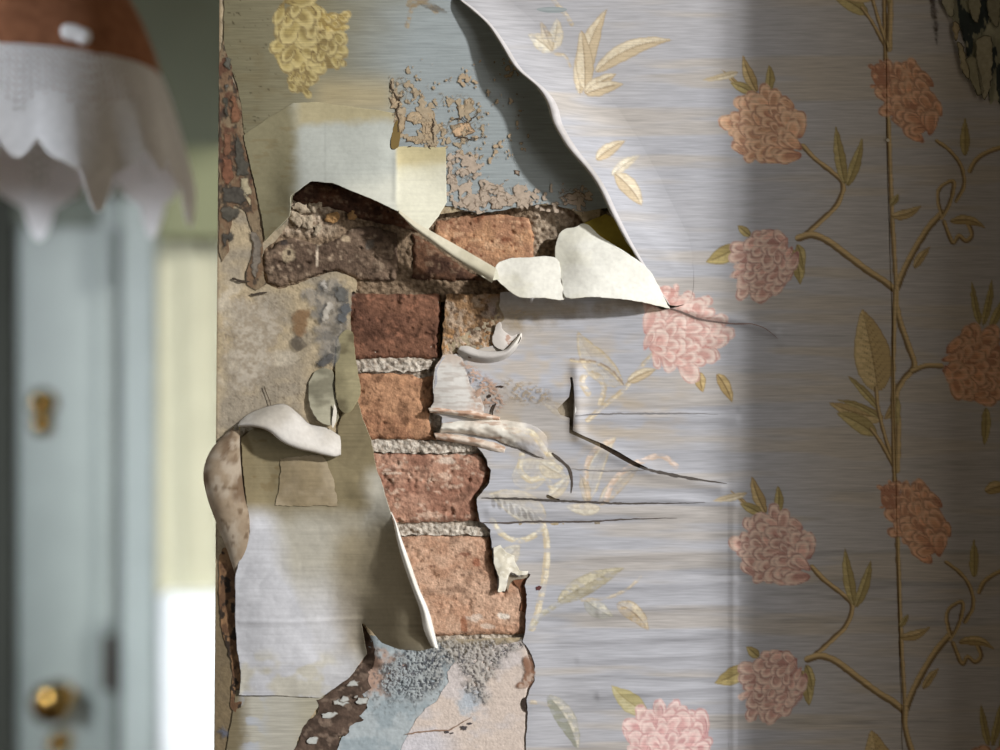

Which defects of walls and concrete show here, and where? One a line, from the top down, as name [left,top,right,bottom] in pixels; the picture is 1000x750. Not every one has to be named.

peeling [203,40,593,750]
crack [572,378,706,425]
crack [552,443,727,493]